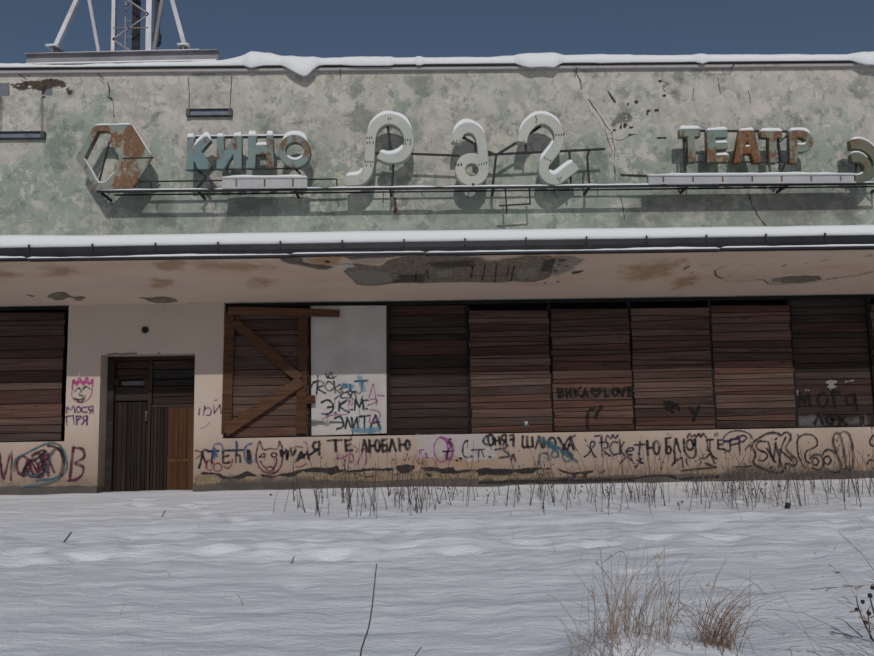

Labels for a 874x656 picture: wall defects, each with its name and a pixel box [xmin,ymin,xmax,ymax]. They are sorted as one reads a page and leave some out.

peeling [11,78,72,95]
crack [575,67,638,220]
spalling [280,255,583,286]
flaking render [48,292,85,301]